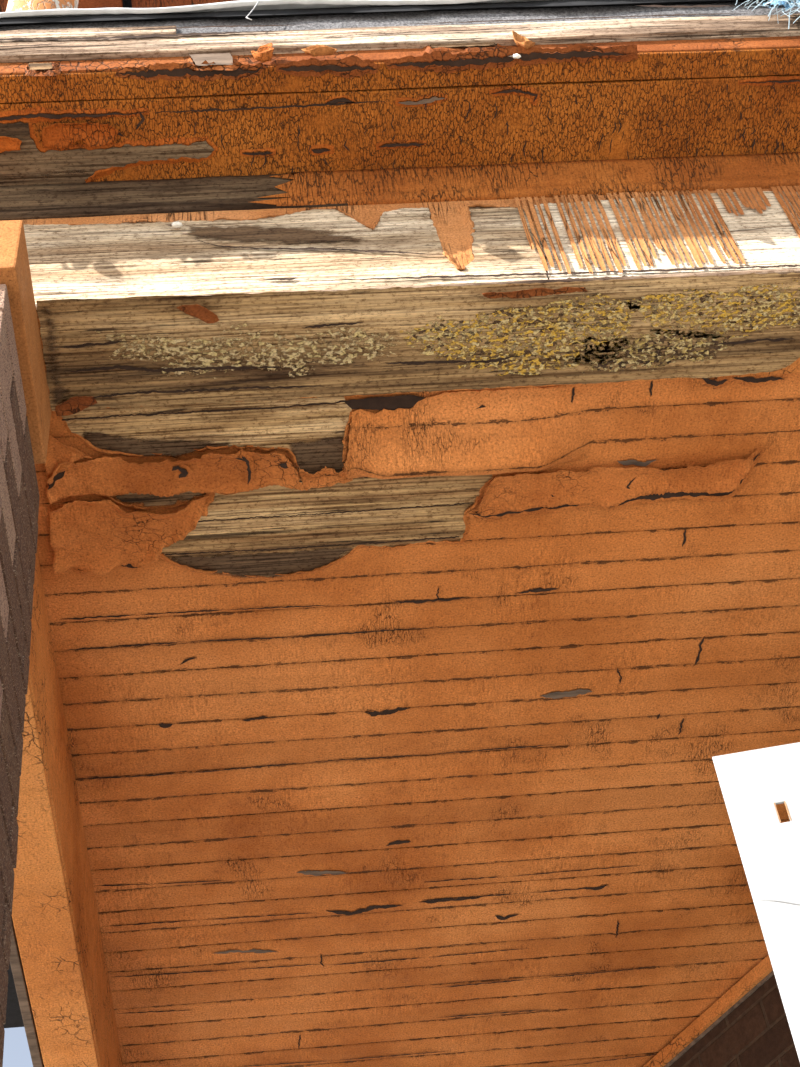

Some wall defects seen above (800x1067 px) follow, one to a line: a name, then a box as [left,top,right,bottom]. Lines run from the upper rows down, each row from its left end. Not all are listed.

peeling [24,62,61,76]
peeling [187,53,238,71]
peeling [251,43,274,63]
peeling [301,45,337,57]
peeling [423,43,502,54]
peeling [512,30,535,49]
peeling [0,120,219,183]
peeling [68,209,312,225]
peeling [327,185,800,299]
peeling [176,304,219,324]
peeling [44,396,754,579]